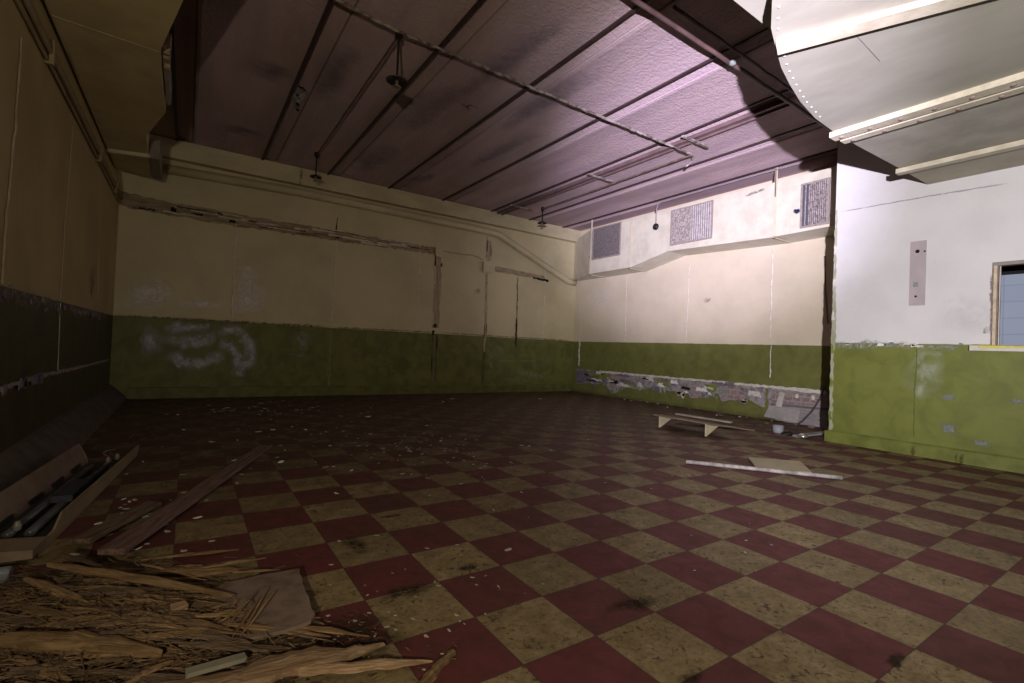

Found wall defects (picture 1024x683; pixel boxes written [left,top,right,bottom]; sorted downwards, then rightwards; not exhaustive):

damp [173,324,255,375]
peeling [120,191,443,335]
spalling [576,210,964,430]